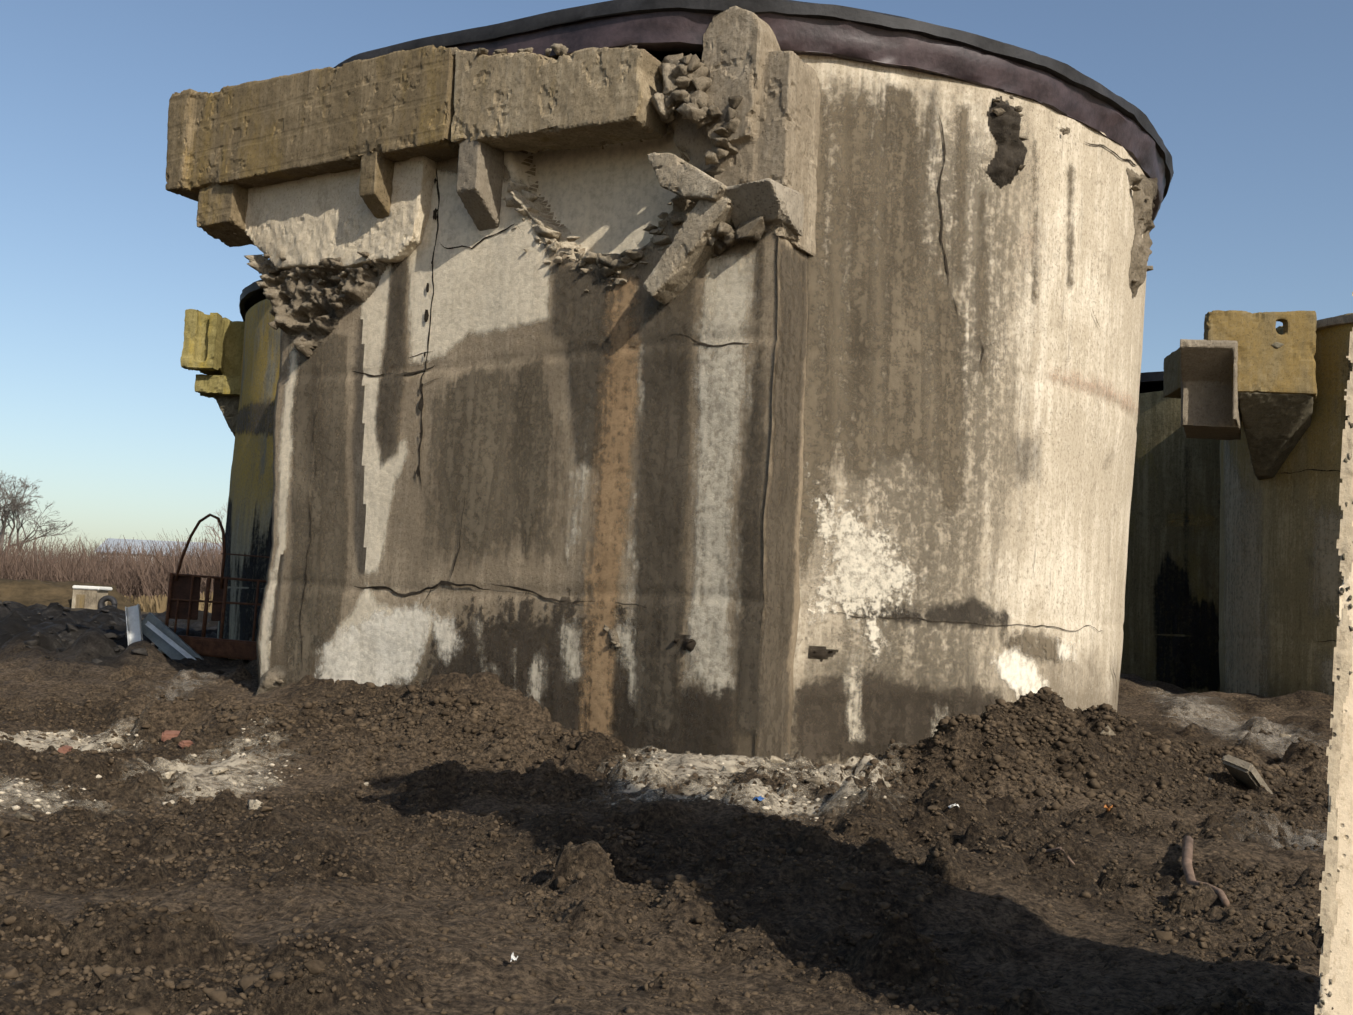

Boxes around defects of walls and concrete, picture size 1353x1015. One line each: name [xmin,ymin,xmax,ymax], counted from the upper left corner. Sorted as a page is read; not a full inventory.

spalling [244,252,408,696]
water stain [285,333,457,686]
water stain [377,258,408,462]
crack [352,170,520,484]
water stain [424,362,556,563]
crack [354,497,645,608]
peeling [408,53,744,363]
corrosion [579,276,640,735]
water stain [616,277,696,732]
water stain [737,83,1076,765]
spalling [986,95,1028,189]
spalling [1126,168,1158,297]